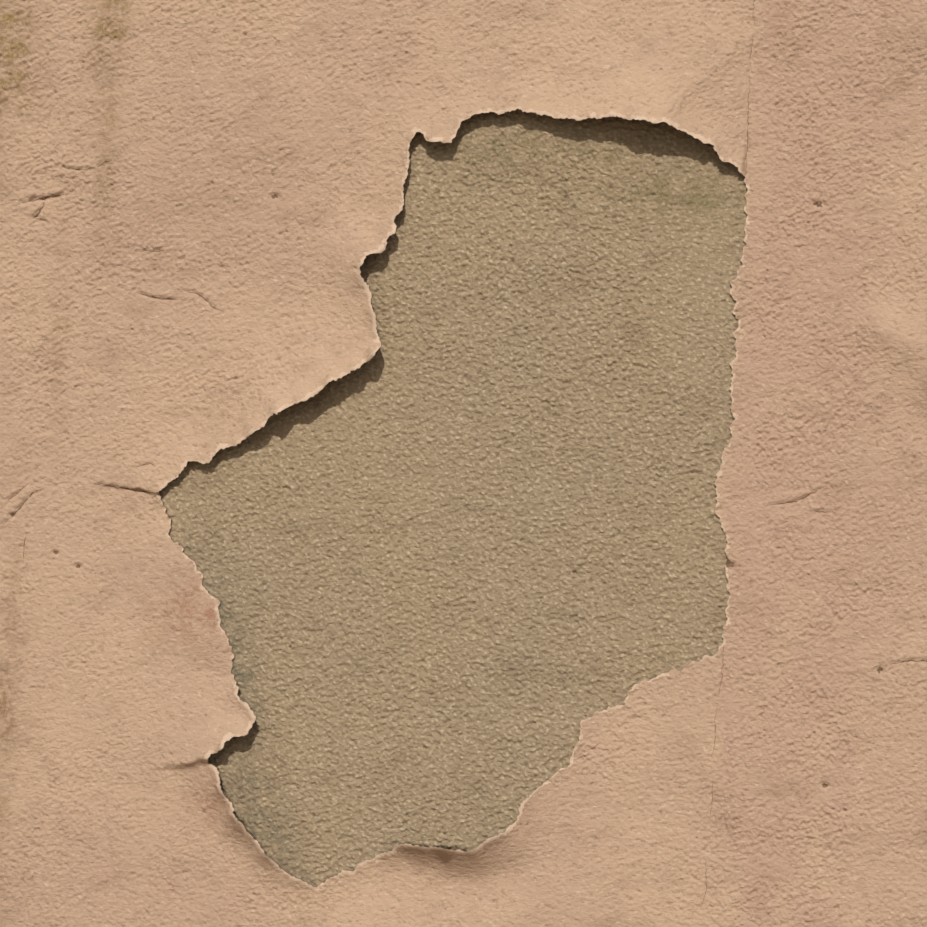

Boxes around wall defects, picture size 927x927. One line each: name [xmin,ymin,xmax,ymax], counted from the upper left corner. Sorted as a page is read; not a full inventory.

peeling [70,47,750,925]